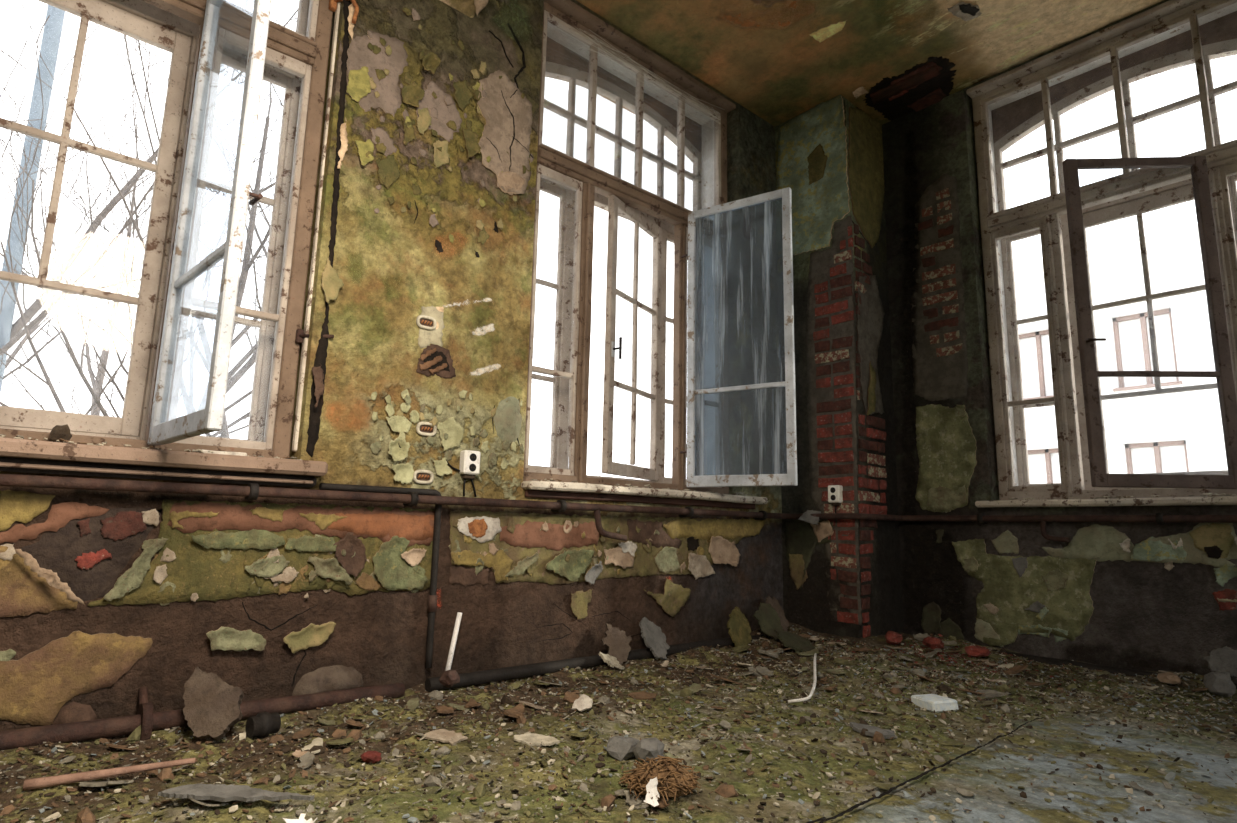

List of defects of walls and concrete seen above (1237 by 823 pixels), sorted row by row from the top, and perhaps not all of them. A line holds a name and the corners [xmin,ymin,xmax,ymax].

spalling [306,0,534,457]
spalling [775,56,956,638]
spalling [912,174,977,513]
peeling [921,523,1237,647]
peeling [0,631,153,726]
peeling [206,626,266,651]
peeling [283,622,336,654]
spalling [514,733,560,746]
spalling [572,694,593,712]